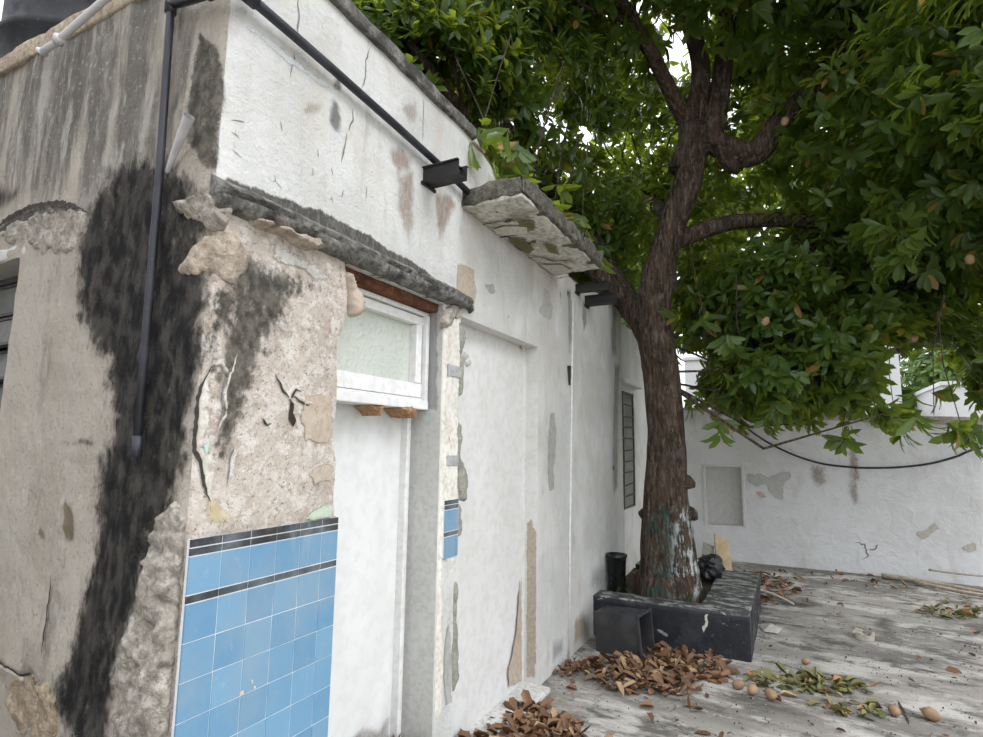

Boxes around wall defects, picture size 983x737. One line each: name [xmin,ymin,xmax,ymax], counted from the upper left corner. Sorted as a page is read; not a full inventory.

leakage [187,34,225,168]
flaking render [178,232,249,285]
flaking render [248,217,332,251]
leakage [226,178,433,278]
leakage [53,154,329,737]
crack [192,356,237,511]
crack [275,374,316,408]
peeling [306,504,332,520]
peeling [428,264,477,721]
peeling [747,472,791,500]
flaking render [110,501,187,737]
peeling [508,519,537,687]